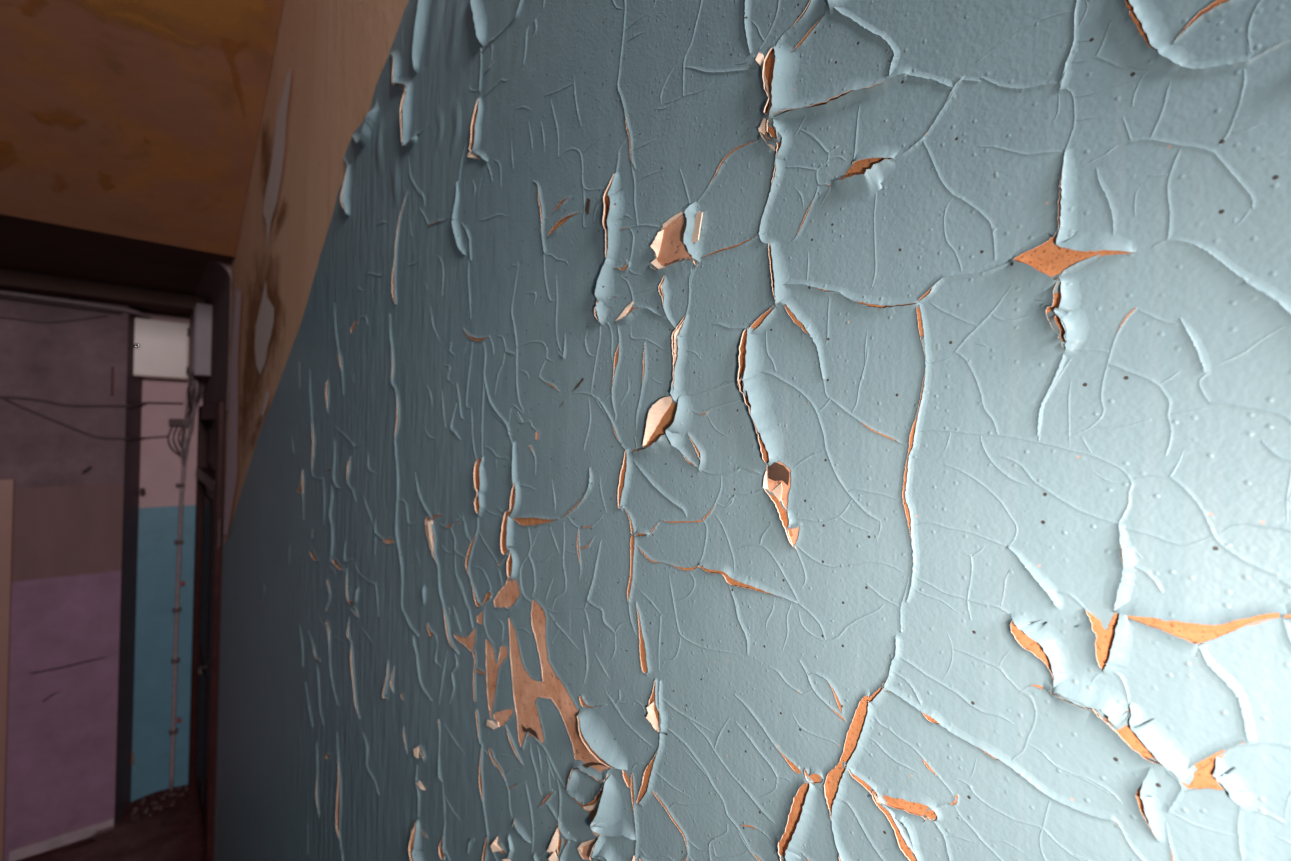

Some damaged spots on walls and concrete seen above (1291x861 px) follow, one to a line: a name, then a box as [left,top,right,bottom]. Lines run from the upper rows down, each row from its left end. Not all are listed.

peeling [254,281,274,374]
peeling [263,71,291,248]
peeling [341,156,352,218]
peeling [352,93,380,149]
peeling [390,0,431,198]
peeling [637,42,1137,436]
peeling [631,380,805,553]
crack [289,0,1291,861]
peeling [452,572,636,861]
peeling [942,579,1291,861]
peeling [842,758,1094,861]